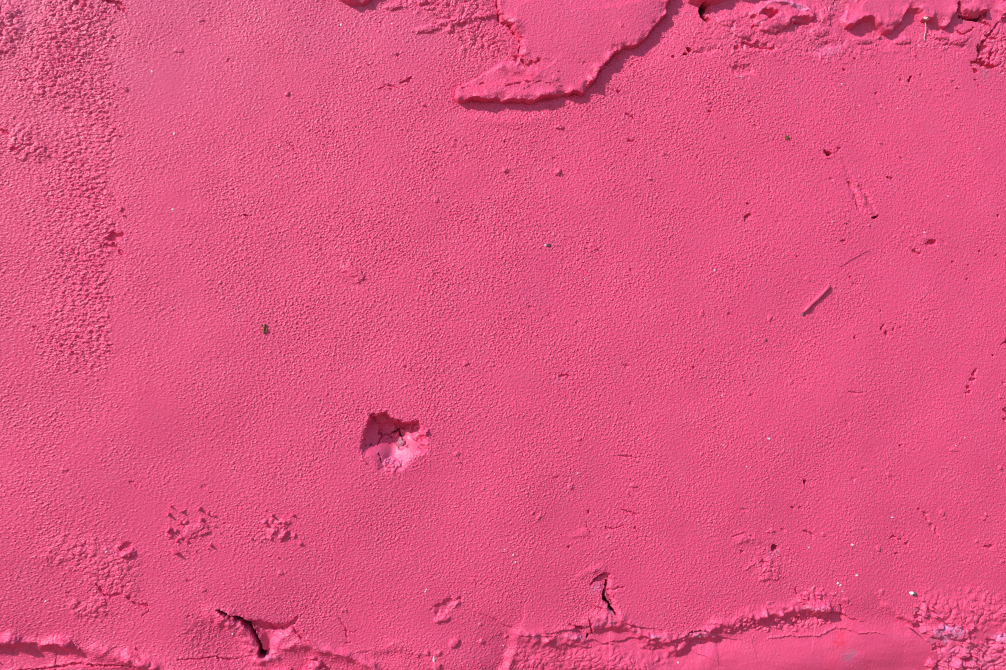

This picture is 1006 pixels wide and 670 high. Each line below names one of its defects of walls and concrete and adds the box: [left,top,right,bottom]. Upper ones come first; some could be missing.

peeling [330,0,670,110]
spalling [683,0,1006,81]
spalling [506,644,654,670]
crack [569,563,625,640]
peeling [683,626,719,641]
spalling [745,544,786,589]
spalling [909,591,1006,670]